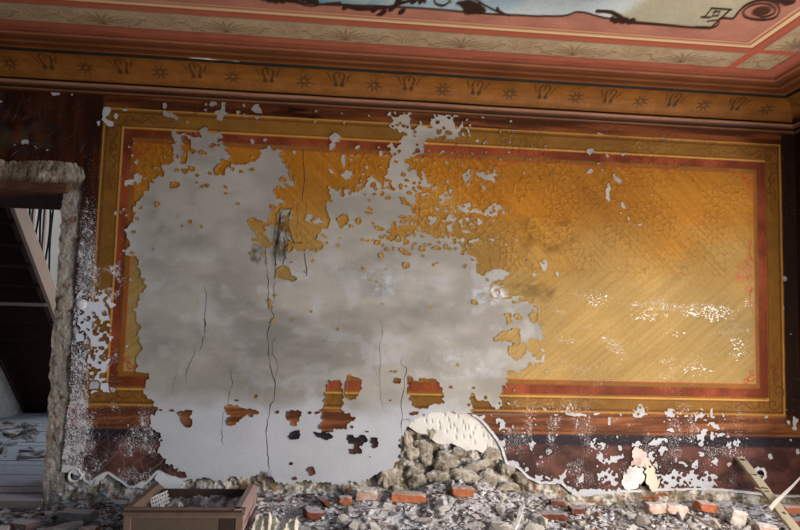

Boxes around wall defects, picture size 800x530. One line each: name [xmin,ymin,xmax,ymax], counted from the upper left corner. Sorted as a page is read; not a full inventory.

crack [173,289,207,386]
crack [265,250,278,466]
peeling [0,101,800,511]